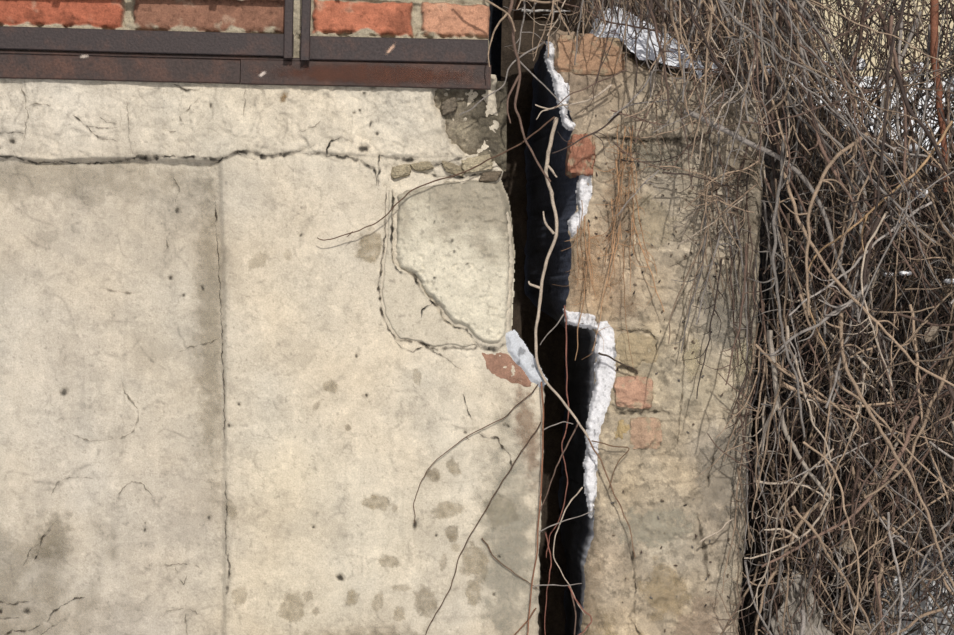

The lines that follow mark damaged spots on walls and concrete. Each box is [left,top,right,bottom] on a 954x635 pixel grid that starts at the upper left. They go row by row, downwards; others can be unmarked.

spalling [391,81,508,182]
peeling [544,41,576,131]
crack [0,89,504,356]
peeling [567,175,593,237]
crack [188,209,226,427]
spalling [482,352,532,387]
peeling [563,309,617,518]